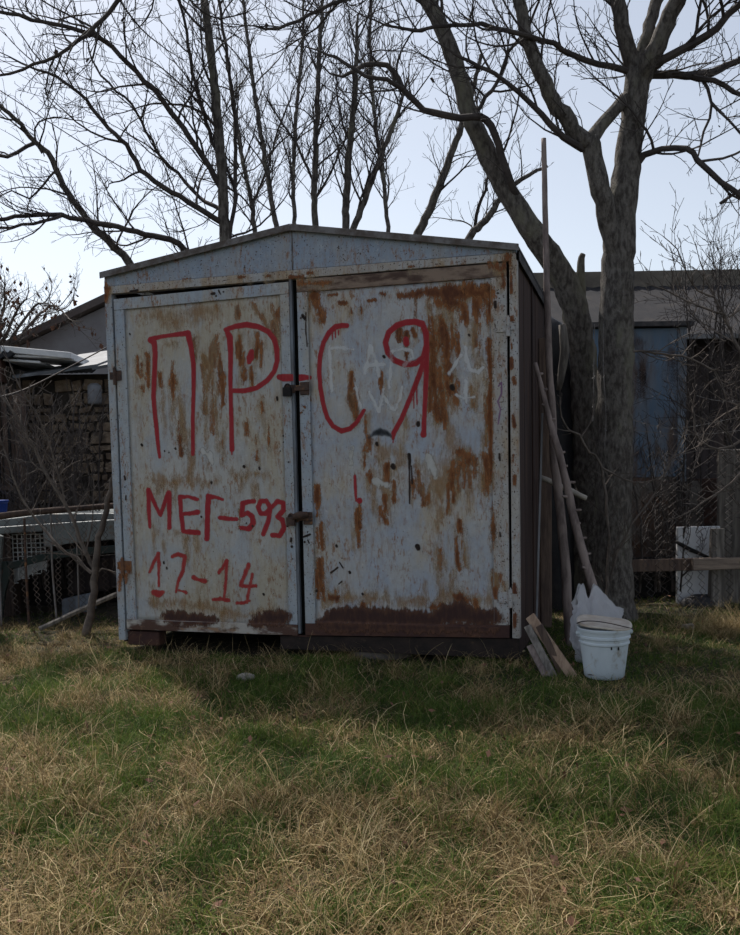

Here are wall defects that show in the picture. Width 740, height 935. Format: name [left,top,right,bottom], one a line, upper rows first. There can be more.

corrosion [288,271,386,325]
corrosion [135,352,178,402]
corrosion [192,333,227,445]
corrosion [234,302,281,386]
corrosion [347,371,397,525]
corrosion [395,253,515,572]
corrosion [313,484,506,636]
corrosion [160,609,220,627]
corrosion [247,608,292,629]